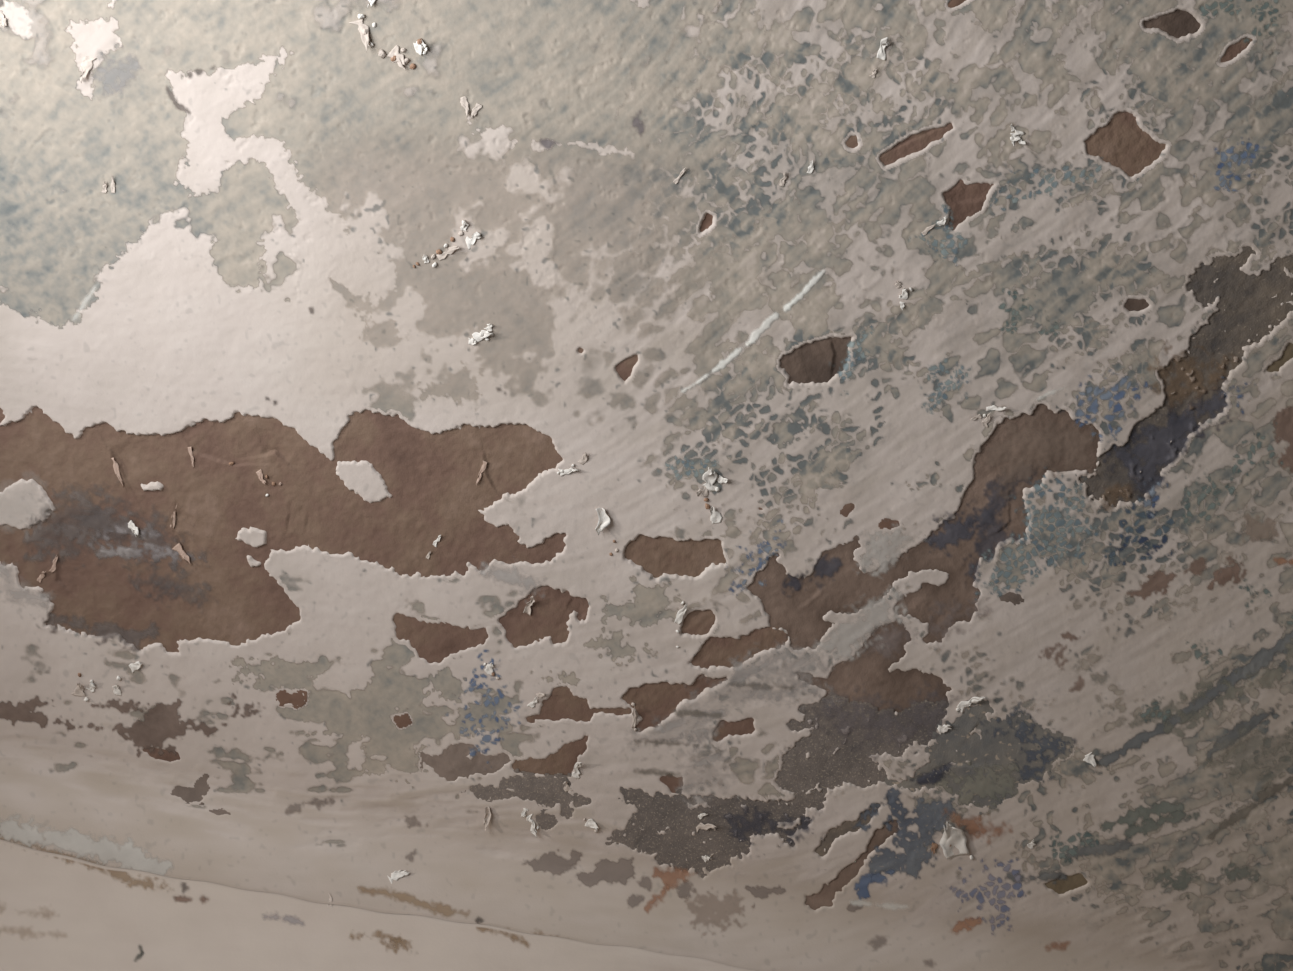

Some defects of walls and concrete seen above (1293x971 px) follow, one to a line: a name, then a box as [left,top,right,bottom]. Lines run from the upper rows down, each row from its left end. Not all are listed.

water stain [682,313,779,393]
water stain [924,376,1228,580]
water stain [1273,407,1293,472]
flaking render [0,384,588,696]
water stain [1127,556,1246,600]
water stain [1045,633,1077,665]
peeling [170,747,283,815]
peeling [229,576,728,837]
peeling [701,718,764,784]
flaking render [805,803,899,910]
water stain [847,706,1075,912]
peeling [1013,646,1293,940]